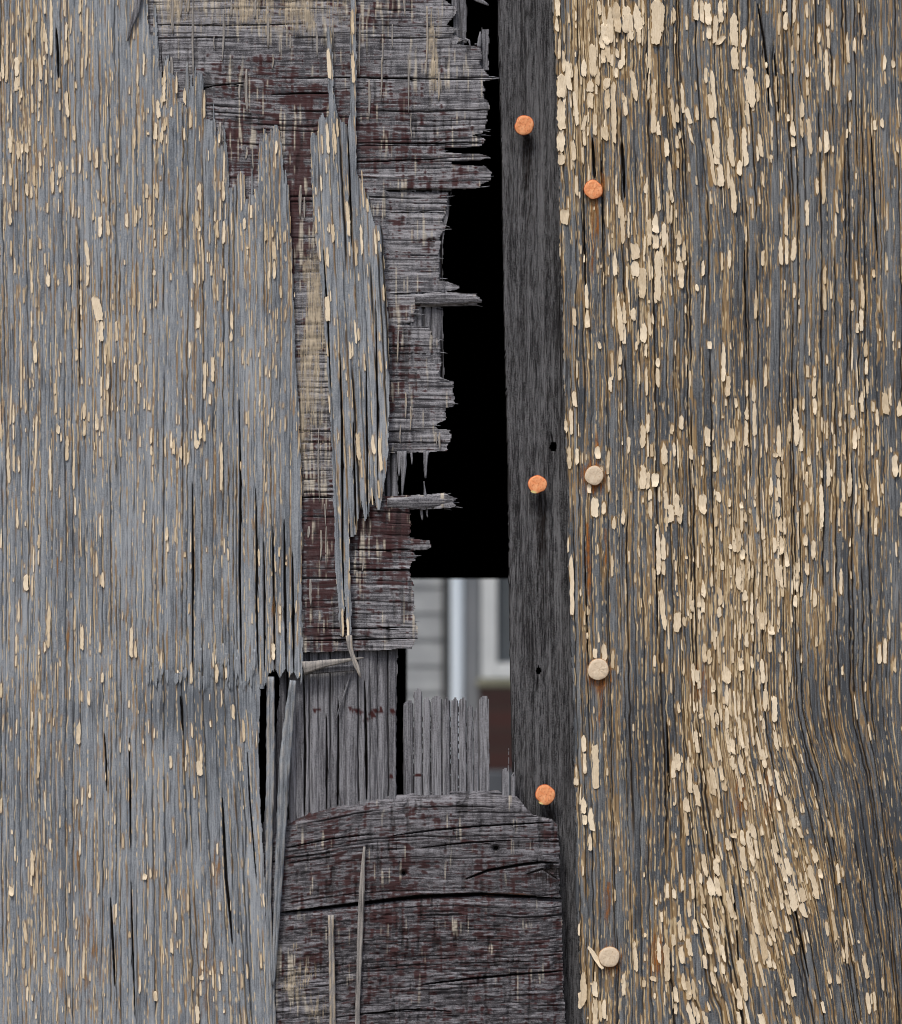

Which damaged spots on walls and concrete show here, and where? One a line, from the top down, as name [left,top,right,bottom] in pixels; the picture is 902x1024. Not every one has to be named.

peeling [315,118,339,195]
peeling [0,0,252,557]
peeling [338,432,383,505]
peeling [555,0,902,1024]
peeling [13,535,40,622]
peeling [260,606,281,684]
peeling [208,643,257,771]
peeling [185,722,203,798]
peeling [6,784,105,1021]
crack [222,798,232,939]
crack [280,822,560,913]
peeling [179,931,262,1024]